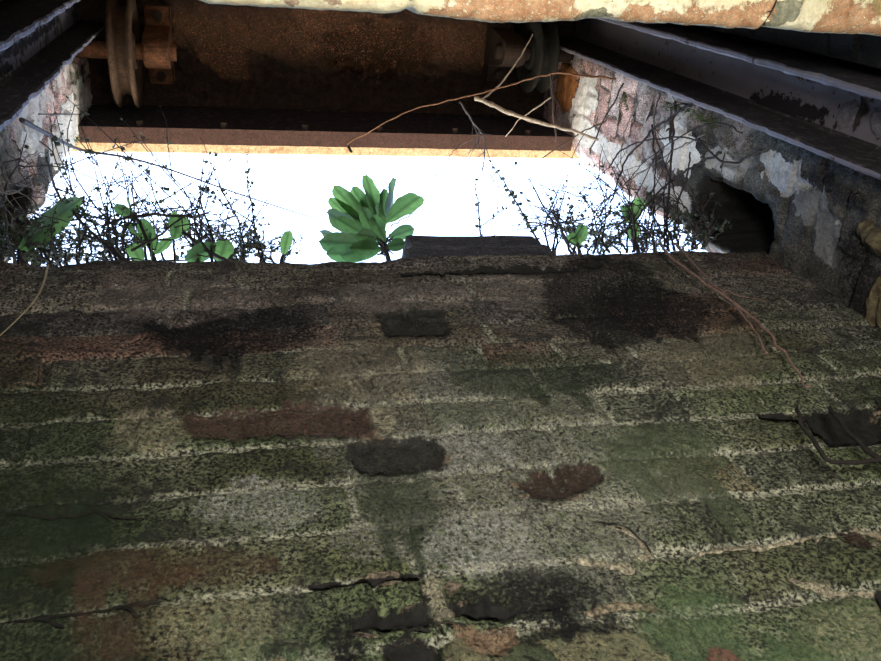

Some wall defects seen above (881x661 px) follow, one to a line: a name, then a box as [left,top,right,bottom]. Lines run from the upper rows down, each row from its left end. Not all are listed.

peeling [424,0,581,23]
peeling [618,0,776,29]
peeling [804,0,881,35]
corrosion [171,2,487,81]
corrosion [555,63,579,113]